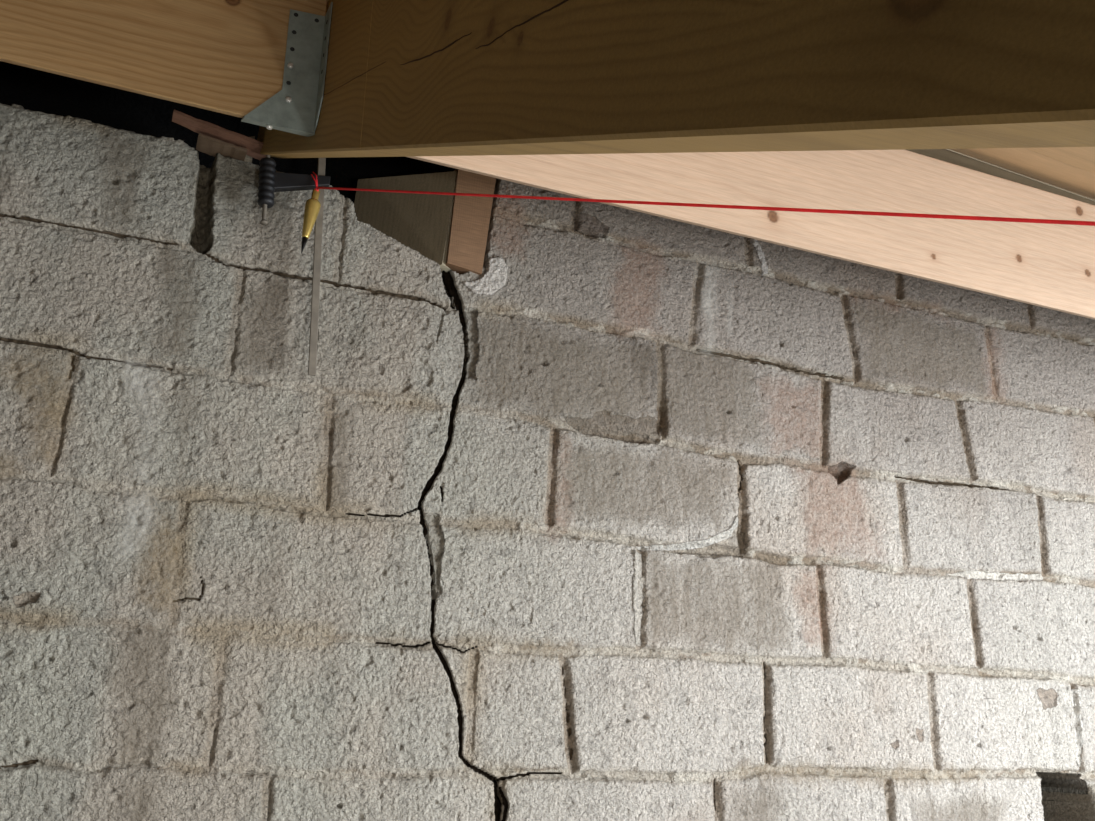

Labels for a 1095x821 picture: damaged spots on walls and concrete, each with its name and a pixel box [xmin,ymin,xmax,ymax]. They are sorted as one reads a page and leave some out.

crack [324,0,568,95]
spalling [188,150,216,254]
crack [0,213,178,245]
crack [0,337,173,379]
crack [205,254,573,821]
crack [173,577,205,602]
crack [0,760,38,769]